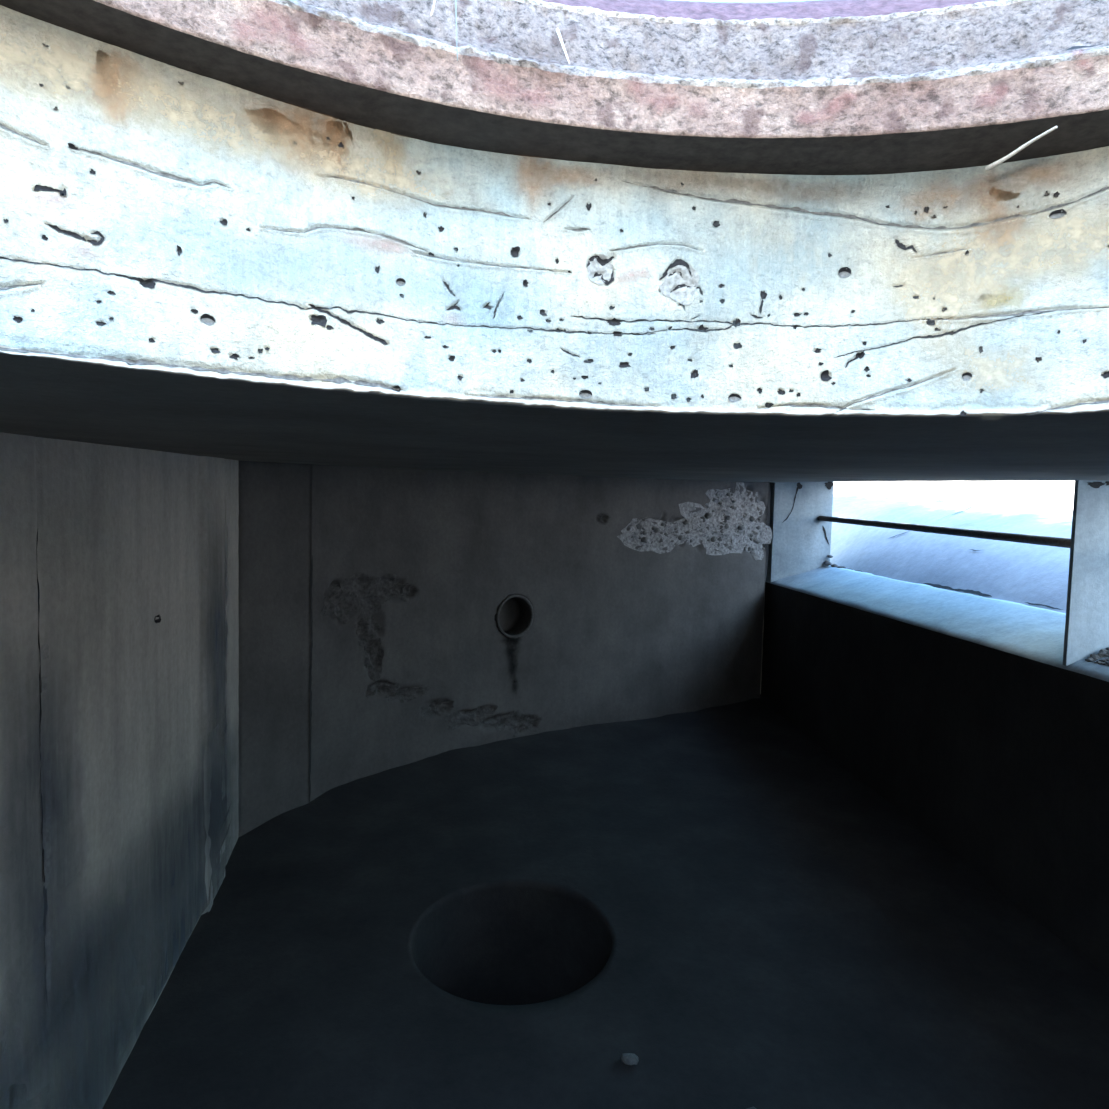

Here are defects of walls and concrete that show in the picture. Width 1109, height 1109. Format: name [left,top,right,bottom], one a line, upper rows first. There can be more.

crack [0,256,1054,358]
spalling [586,254,614,285]
spalling [659,259,703,311]
spalling [617,482,772,560]